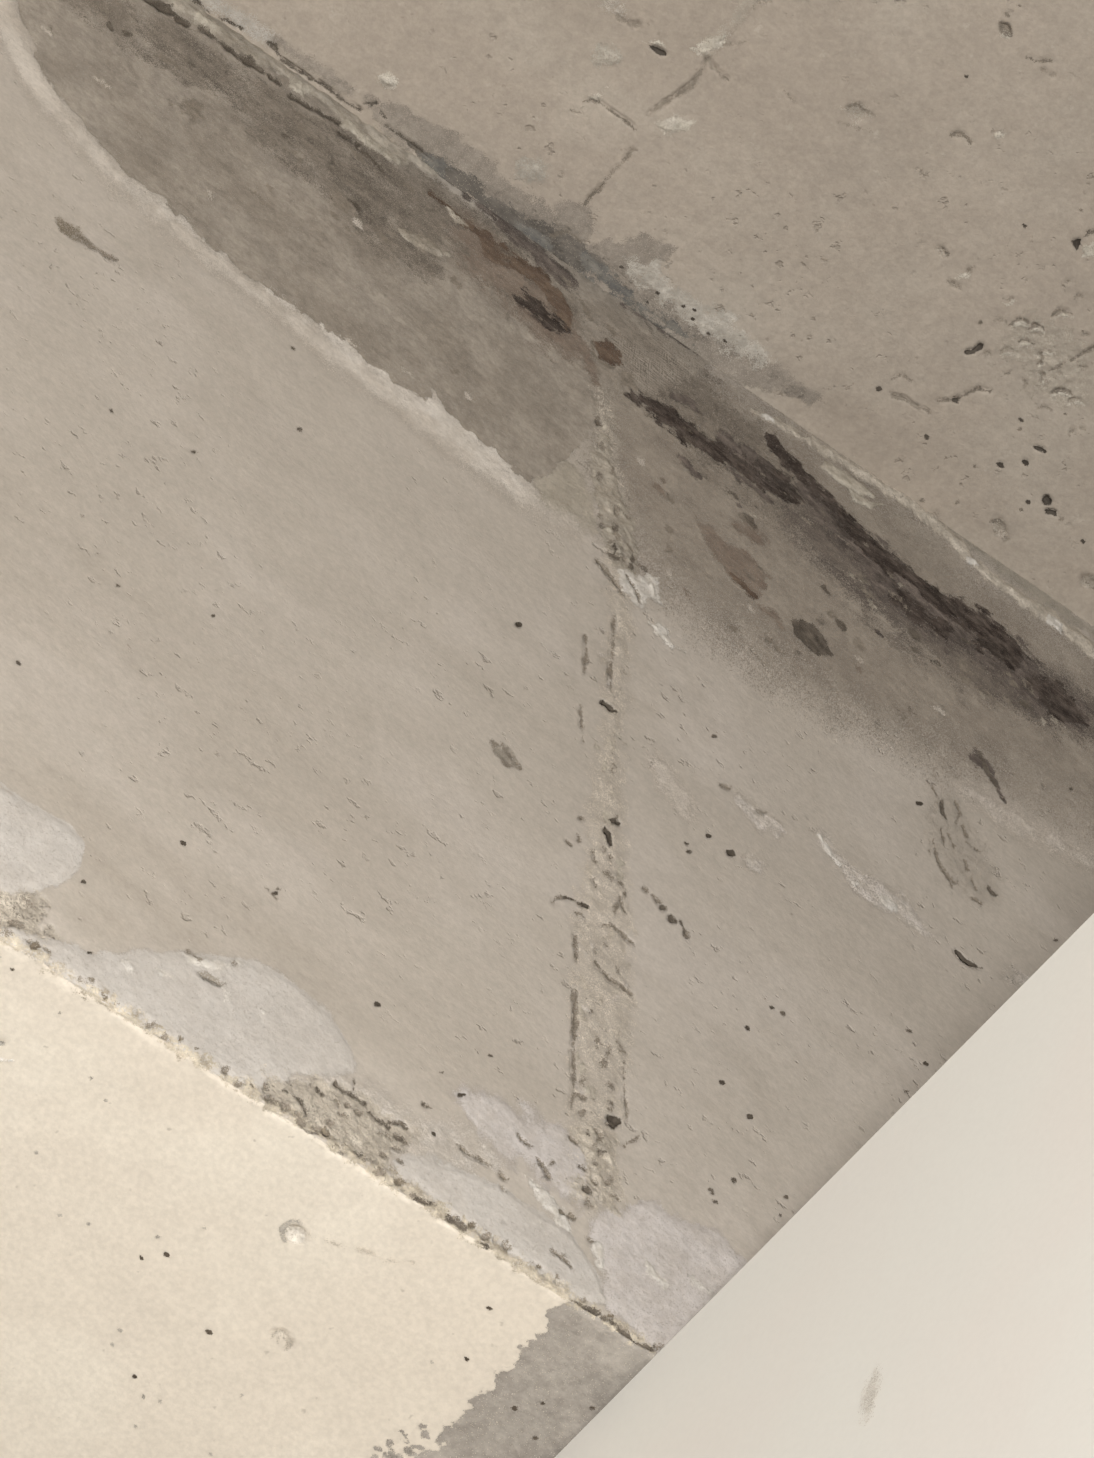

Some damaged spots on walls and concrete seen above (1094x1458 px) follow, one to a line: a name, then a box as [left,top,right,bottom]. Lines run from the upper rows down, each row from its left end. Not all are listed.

peeling [0,886,665,1458]
damp [0,0,1094,850]
crack [537,383,641,1179]
spalling [642,886,691,939]